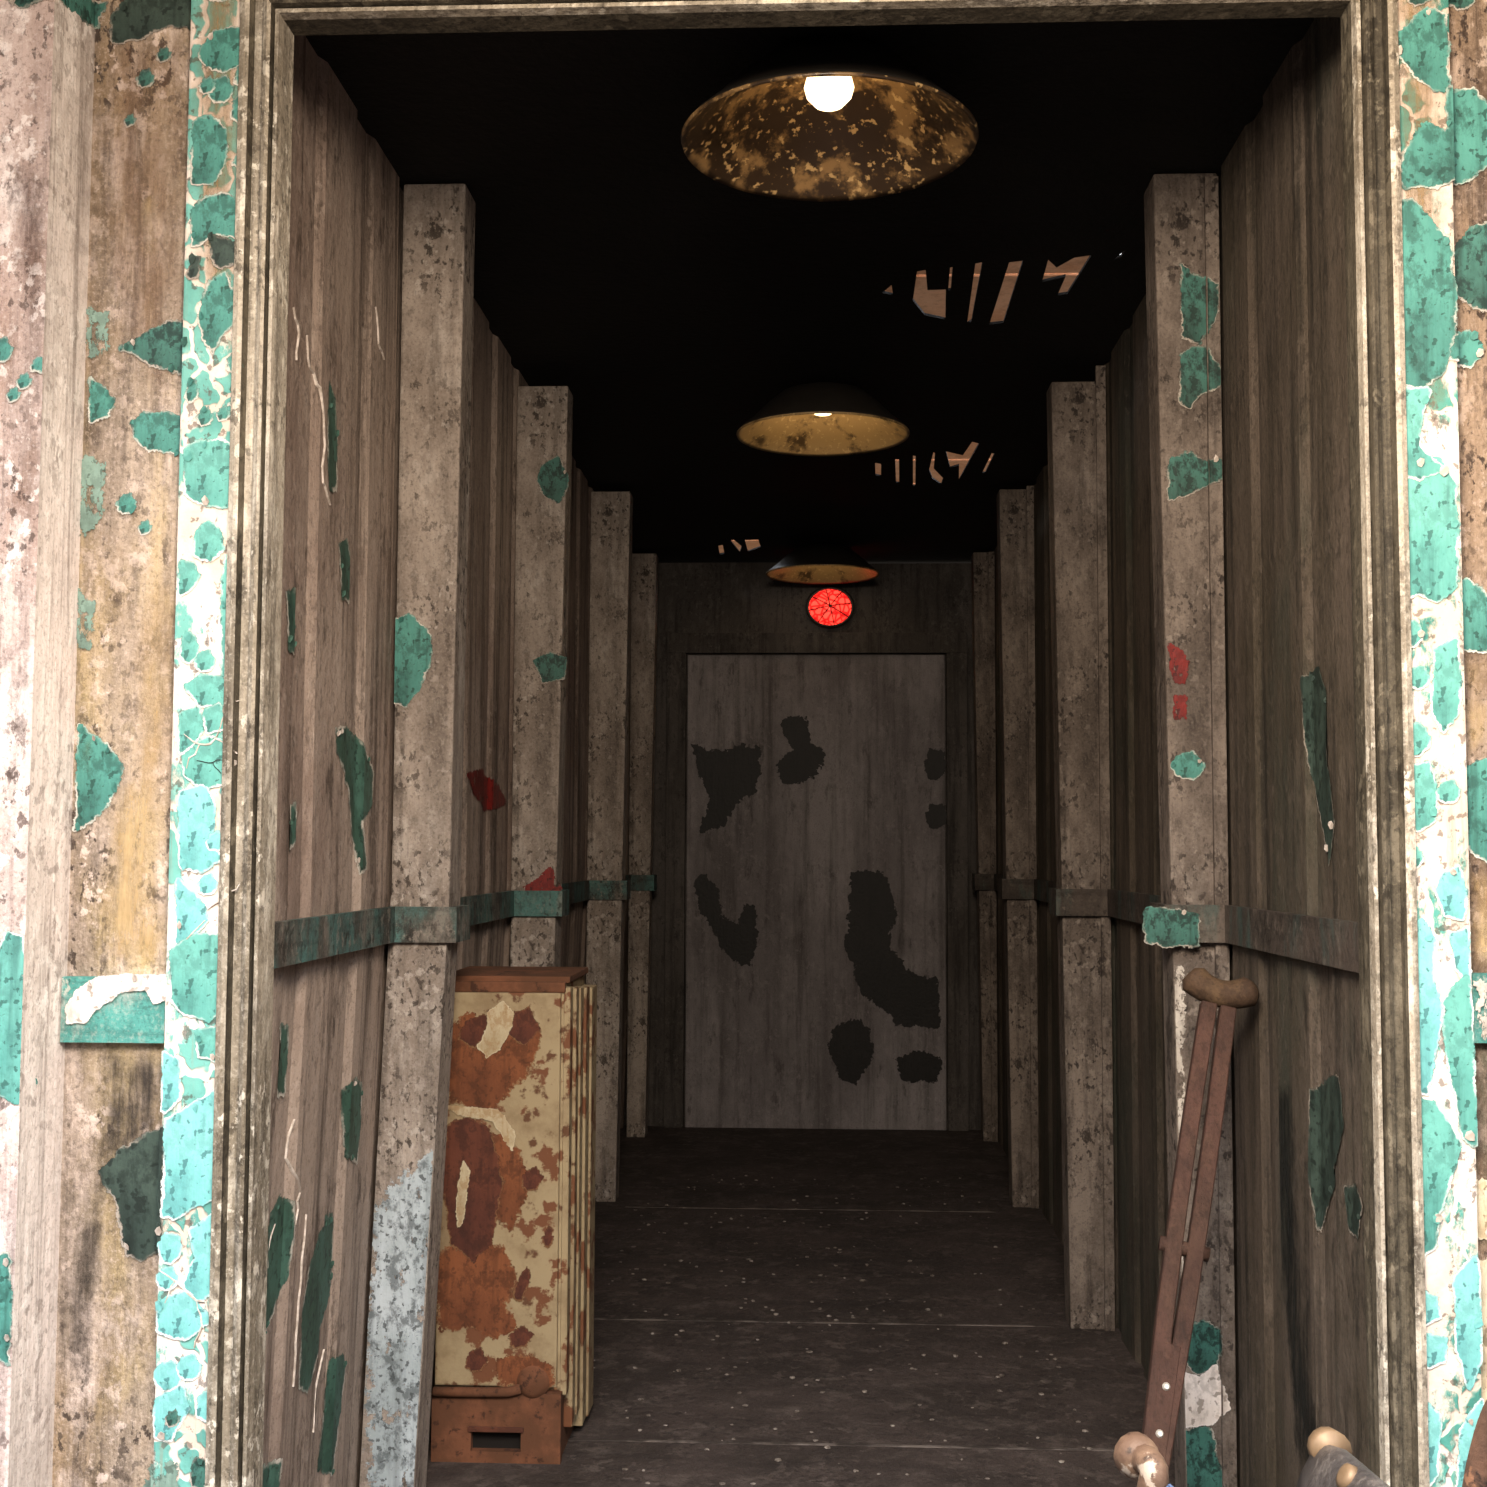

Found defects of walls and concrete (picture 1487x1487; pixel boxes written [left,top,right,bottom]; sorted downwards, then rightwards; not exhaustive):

peeling [8,0,43,9]
peeling [0,336,14,363]
peeling [6,356,43,403]
peeling [1398,0,1487,1258]
peeling [61,0,240,1442]
peeling [0,931,38,1105]
peeling [1425,1178,1487,1487]
peeling [143,1456,205,1487]